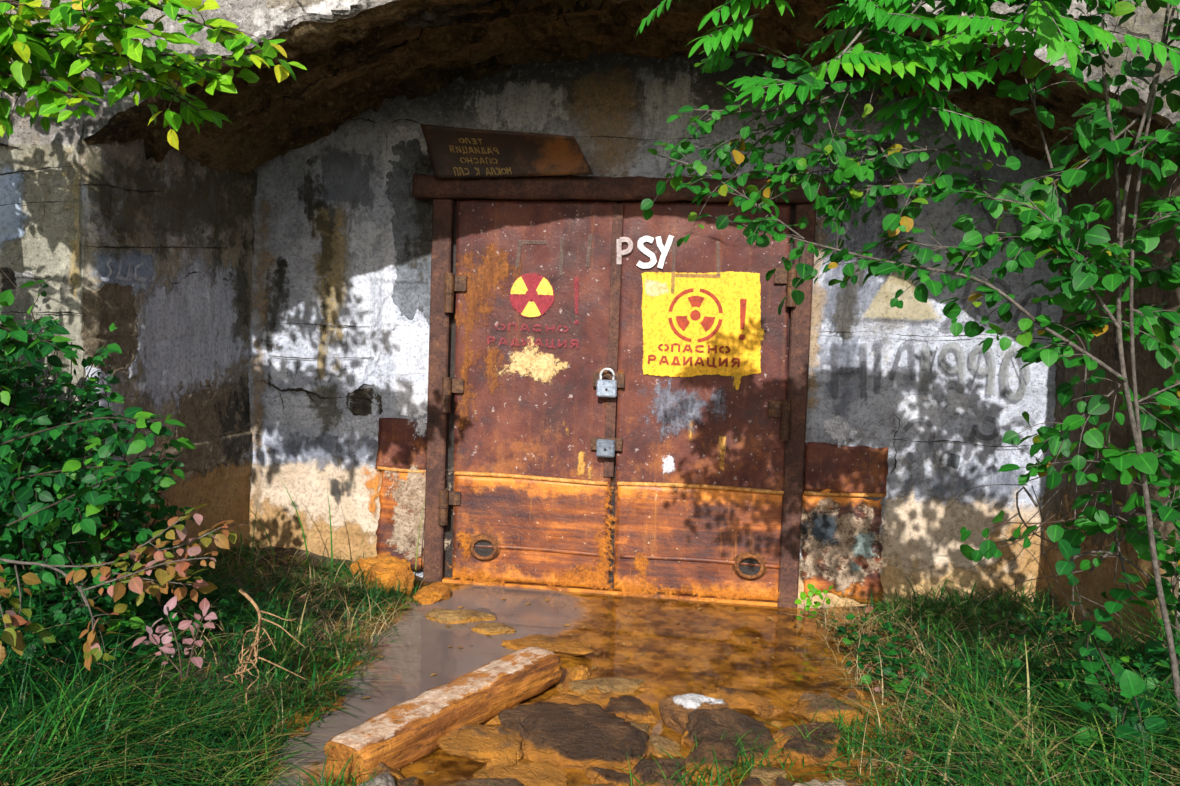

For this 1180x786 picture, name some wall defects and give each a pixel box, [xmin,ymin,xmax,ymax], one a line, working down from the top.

spalling [266,0,368,20]
water stain [404,153,433,284]
water stain [298,146,388,423]
rust [455,244,521,429]
water stain [89,225,426,571]
spalling [166,361,383,477]
rust [577,452,591,478]
rust [450,532,505,586]
rust [548,487,780,602]